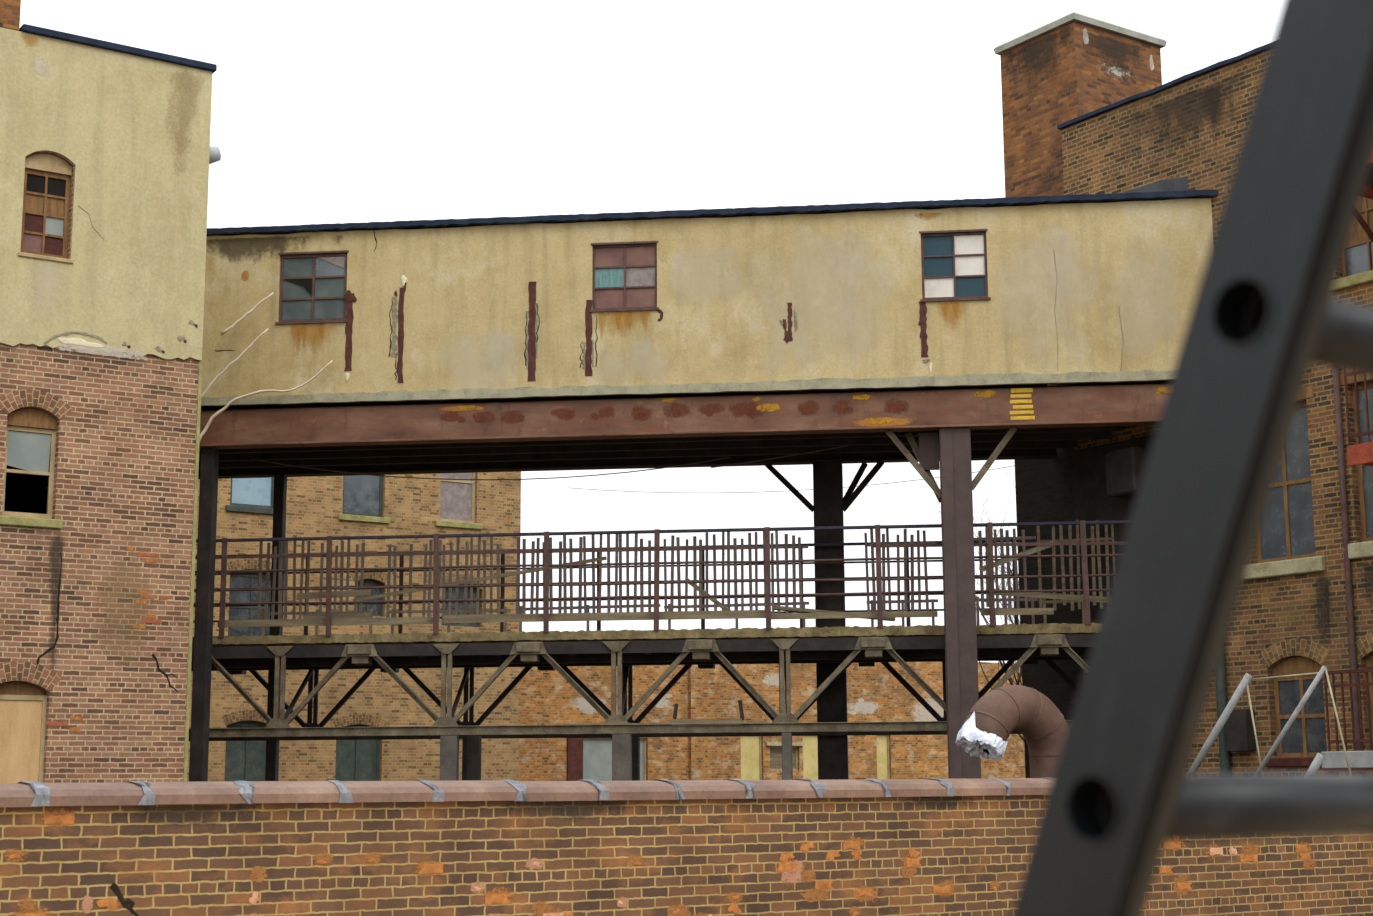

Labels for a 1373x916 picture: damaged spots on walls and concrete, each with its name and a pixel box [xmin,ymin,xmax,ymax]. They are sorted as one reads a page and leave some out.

peeling [58,338,165,359]
rust [442,411,524,423]
rust [633,402,762,421]
crack [151,653,178,692]
crack [110,882,139,916]